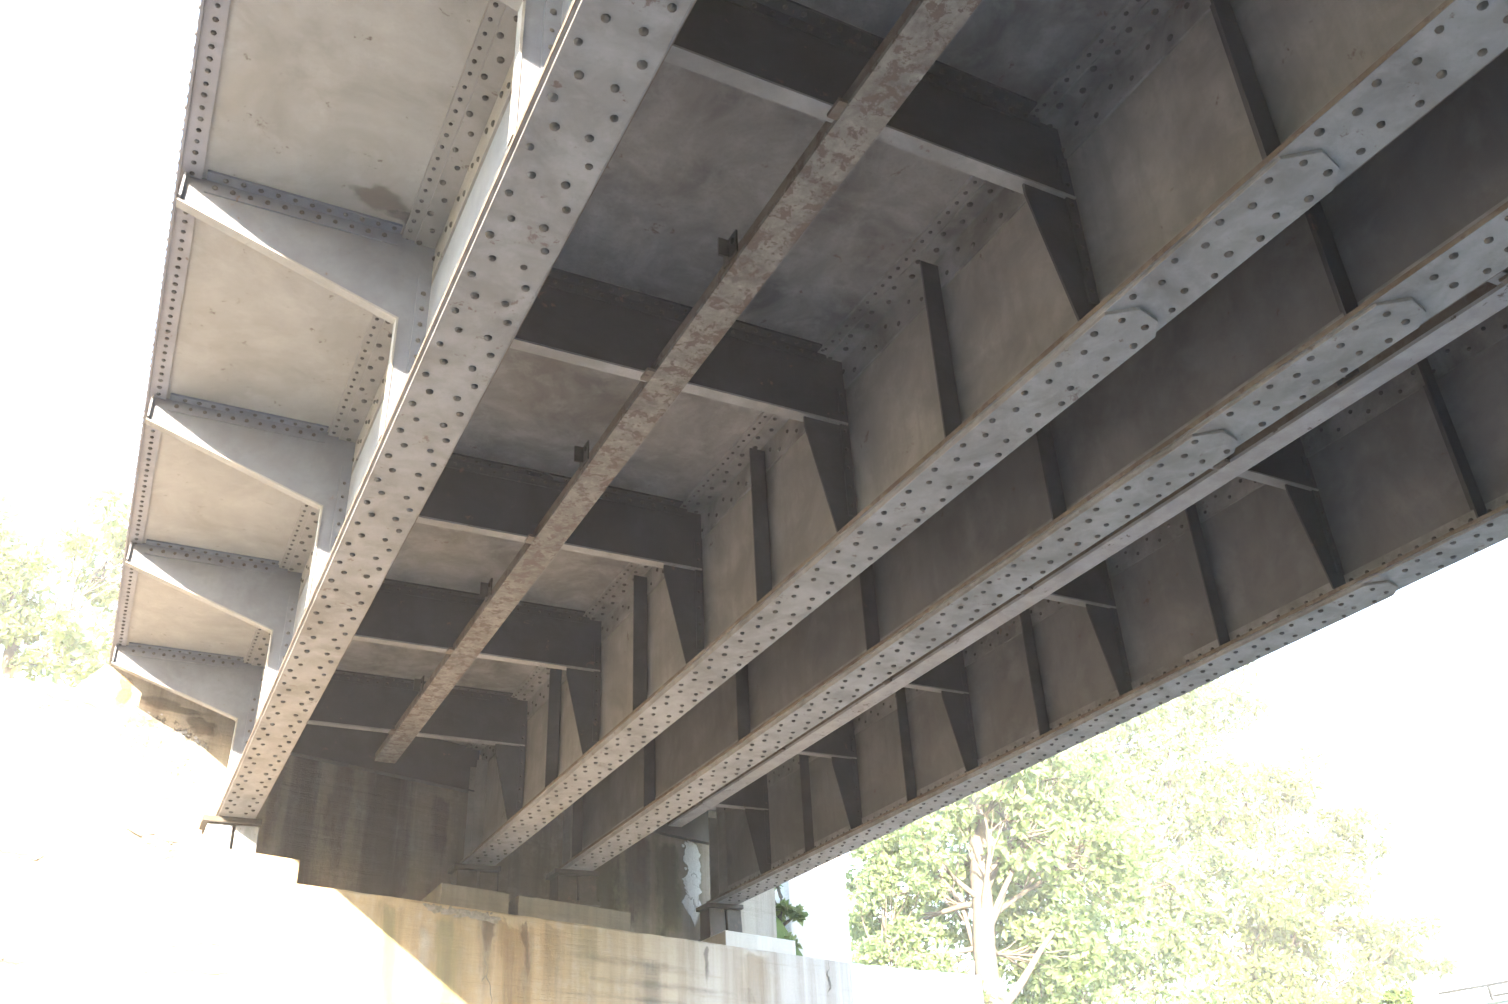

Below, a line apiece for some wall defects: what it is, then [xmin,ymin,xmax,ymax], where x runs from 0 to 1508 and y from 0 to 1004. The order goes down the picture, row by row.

rust [115,677,132,708]
leakage [594,856,619,910]